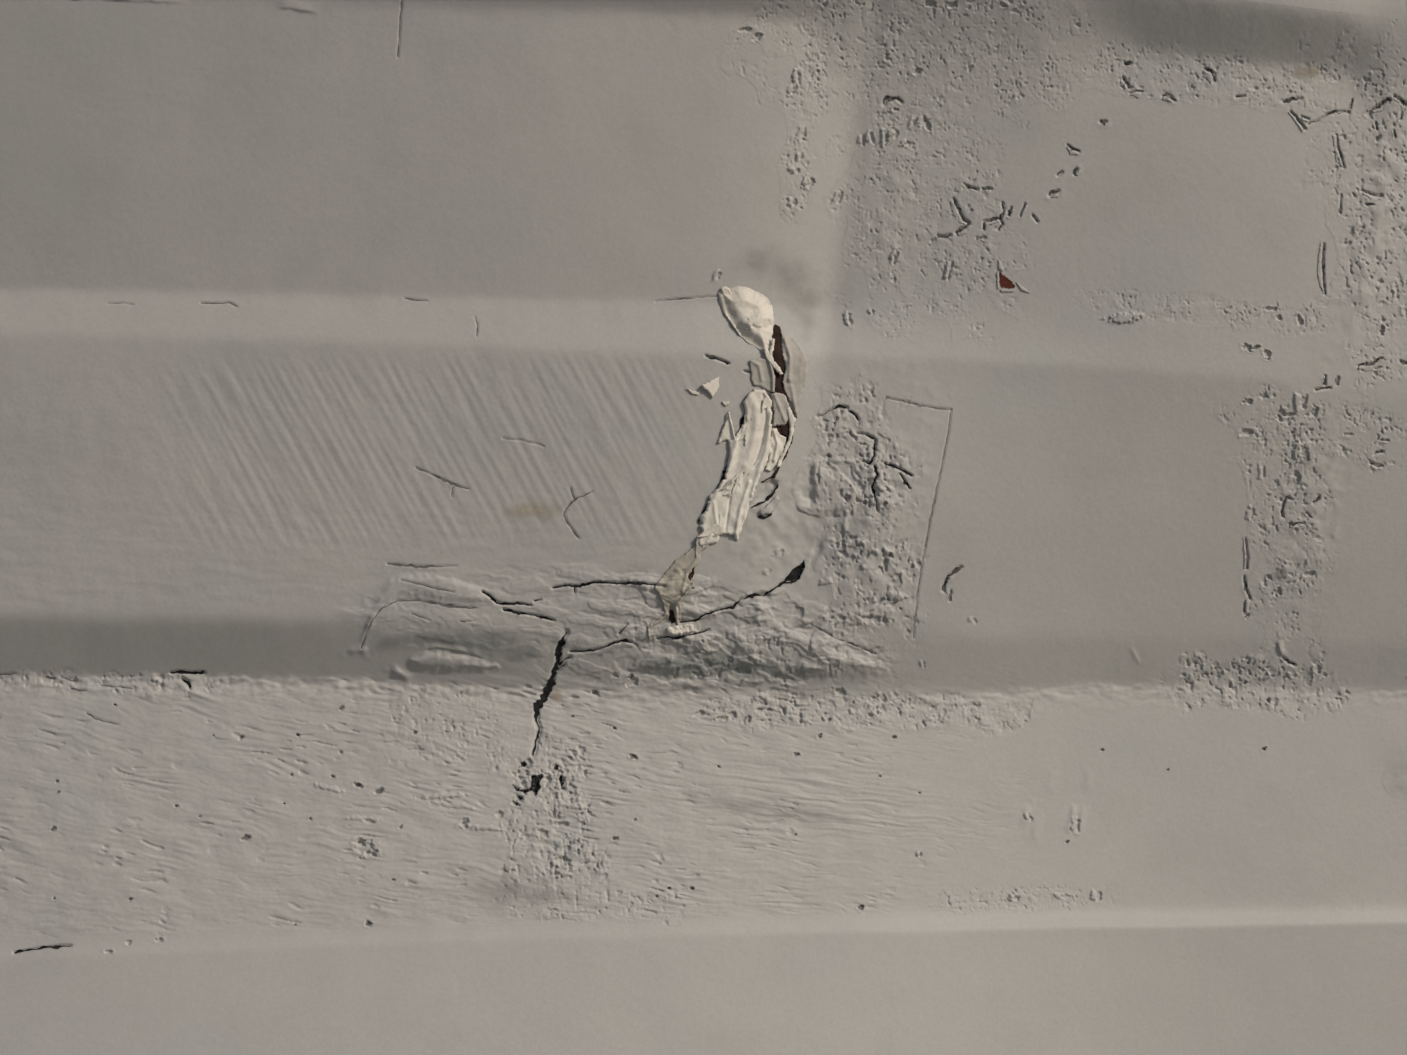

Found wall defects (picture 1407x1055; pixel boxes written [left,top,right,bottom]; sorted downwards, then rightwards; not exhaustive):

spalling [718,0,1407,718]
peeling [687,377,736,444]
crack [361,563,784,755]
peeling [666,624,694,635]
spalling [703,688,1035,733]